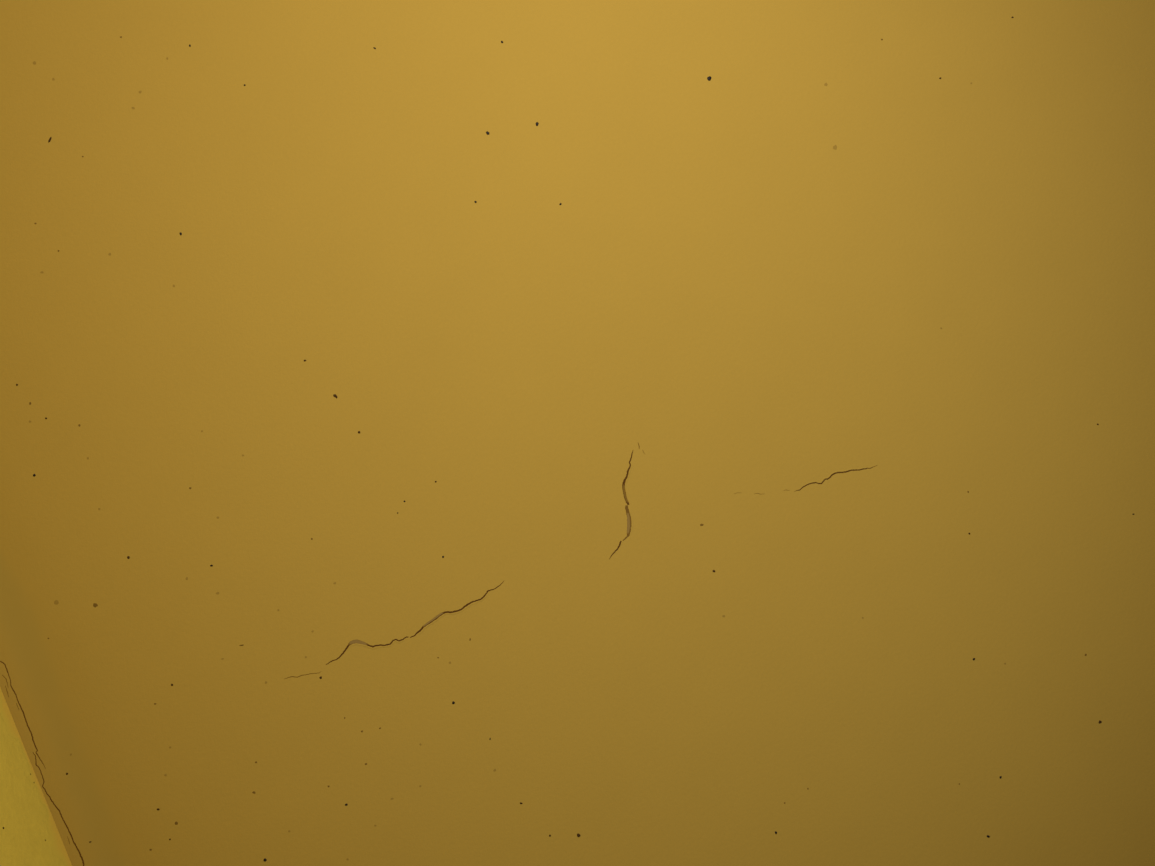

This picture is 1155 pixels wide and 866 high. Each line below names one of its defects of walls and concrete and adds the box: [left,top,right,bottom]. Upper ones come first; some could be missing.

crack [610,443,645,558]
crack [755,465,877,494]
crack [285,581,504,679]
crack [0,661,84,866]